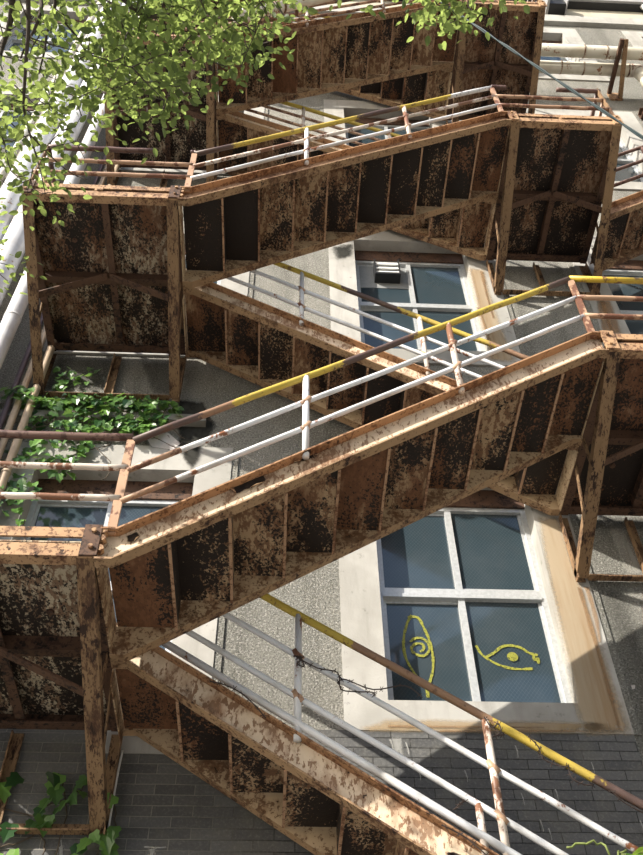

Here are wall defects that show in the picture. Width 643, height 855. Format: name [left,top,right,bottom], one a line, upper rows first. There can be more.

rust [369,518,626,733]